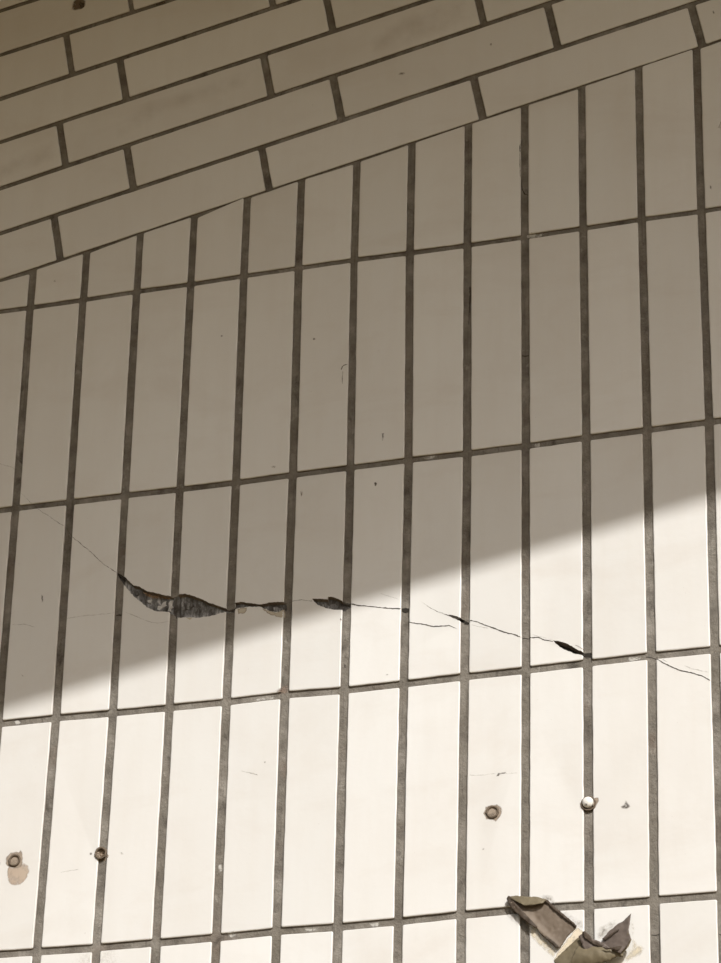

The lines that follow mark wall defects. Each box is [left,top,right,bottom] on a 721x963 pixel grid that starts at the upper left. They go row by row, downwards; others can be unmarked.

crack [42,512,126,581]
spalling [119,577,287,619]
spalling [315,600,351,611]
crack [341,601,553,642]
crack [647,657,721,684]